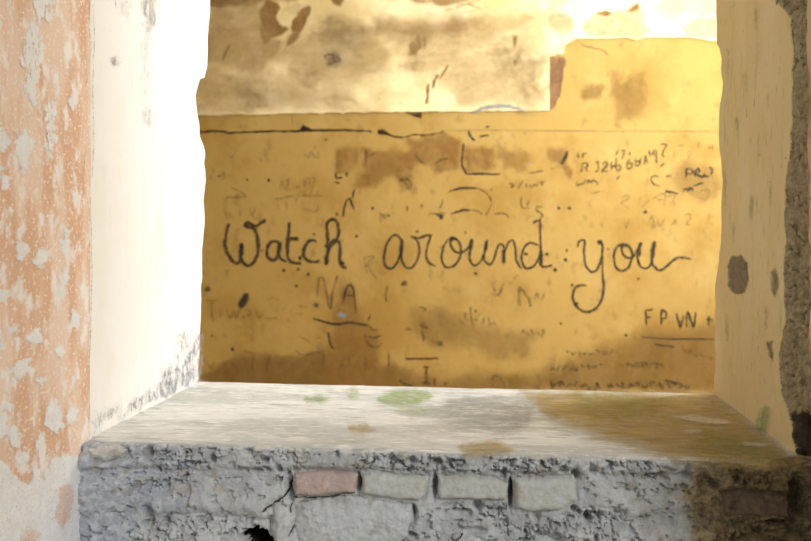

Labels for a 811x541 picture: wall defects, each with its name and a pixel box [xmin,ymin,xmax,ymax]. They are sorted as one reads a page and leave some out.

peeling [0,0,59,190]
damp [196,0,561,124]
peeling [15,223,74,300]
spalling [775,0,811,456]
peeling [0,398,23,448]
peeling [0,323,43,351]
peeling [35,399,80,452]
damp [91,277,806,477]
crack [262,475,355,535]
spalling [0,439,811,541]